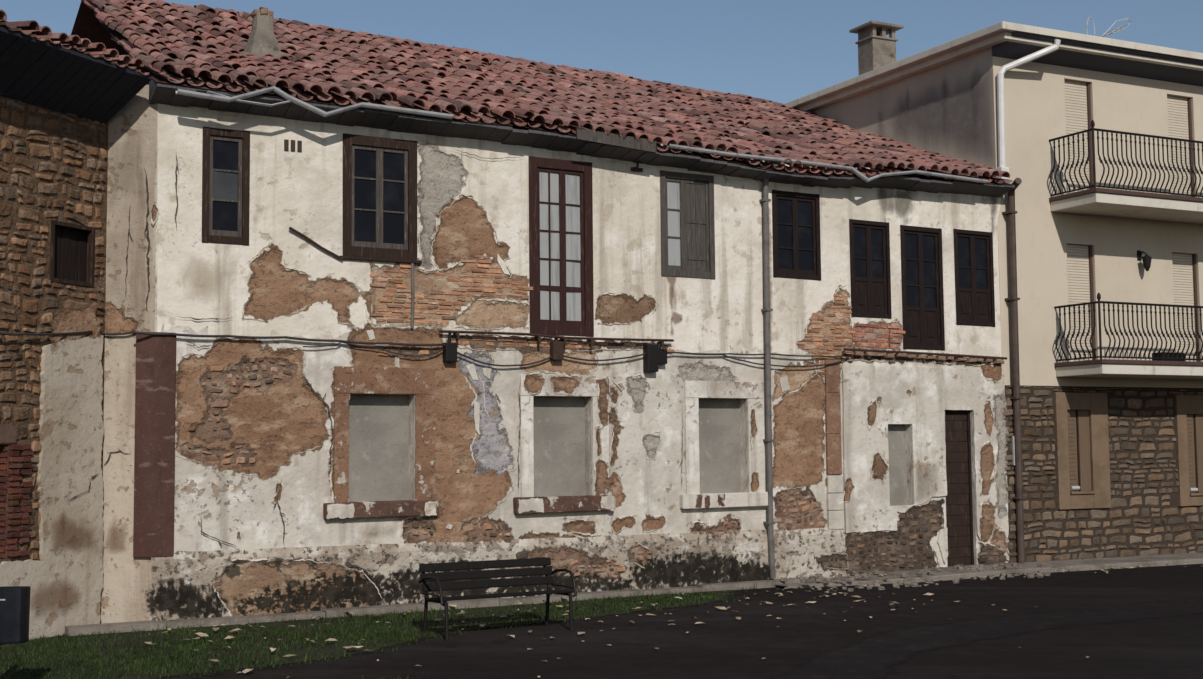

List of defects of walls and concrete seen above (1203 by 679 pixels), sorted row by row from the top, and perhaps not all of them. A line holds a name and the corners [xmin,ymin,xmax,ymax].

crack [125,156,179,311]
crack [177,316,232,349]
flaking render [242,142,675,569]
flaking render [677,360,739,382]
flaking render [175,337,355,519]
flaking render [750,285,1010,574]
crack [70,450,131,500]
flaking render [690,493,742,535]
water stain [145,552,771,620]